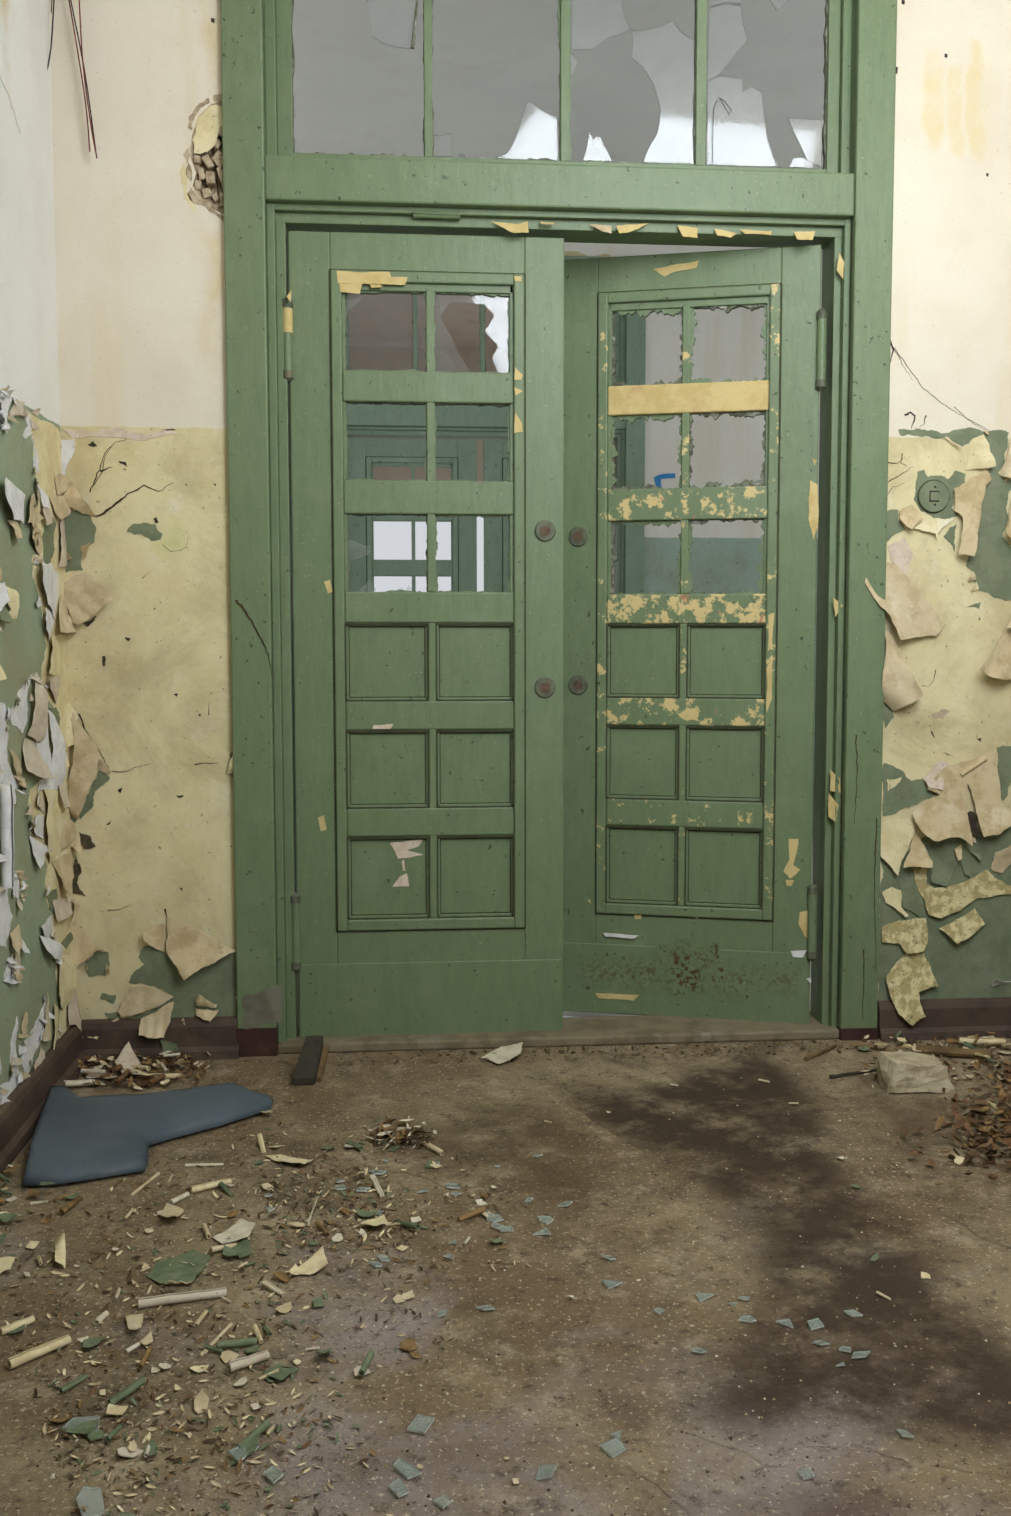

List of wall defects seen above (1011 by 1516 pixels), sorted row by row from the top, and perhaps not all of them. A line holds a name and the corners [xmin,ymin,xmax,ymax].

flaking render [180,94,224,222]
peeling [864,427,1011,728]
peeling [0,385,283,1105]
peeling [874,746,1011,1026]